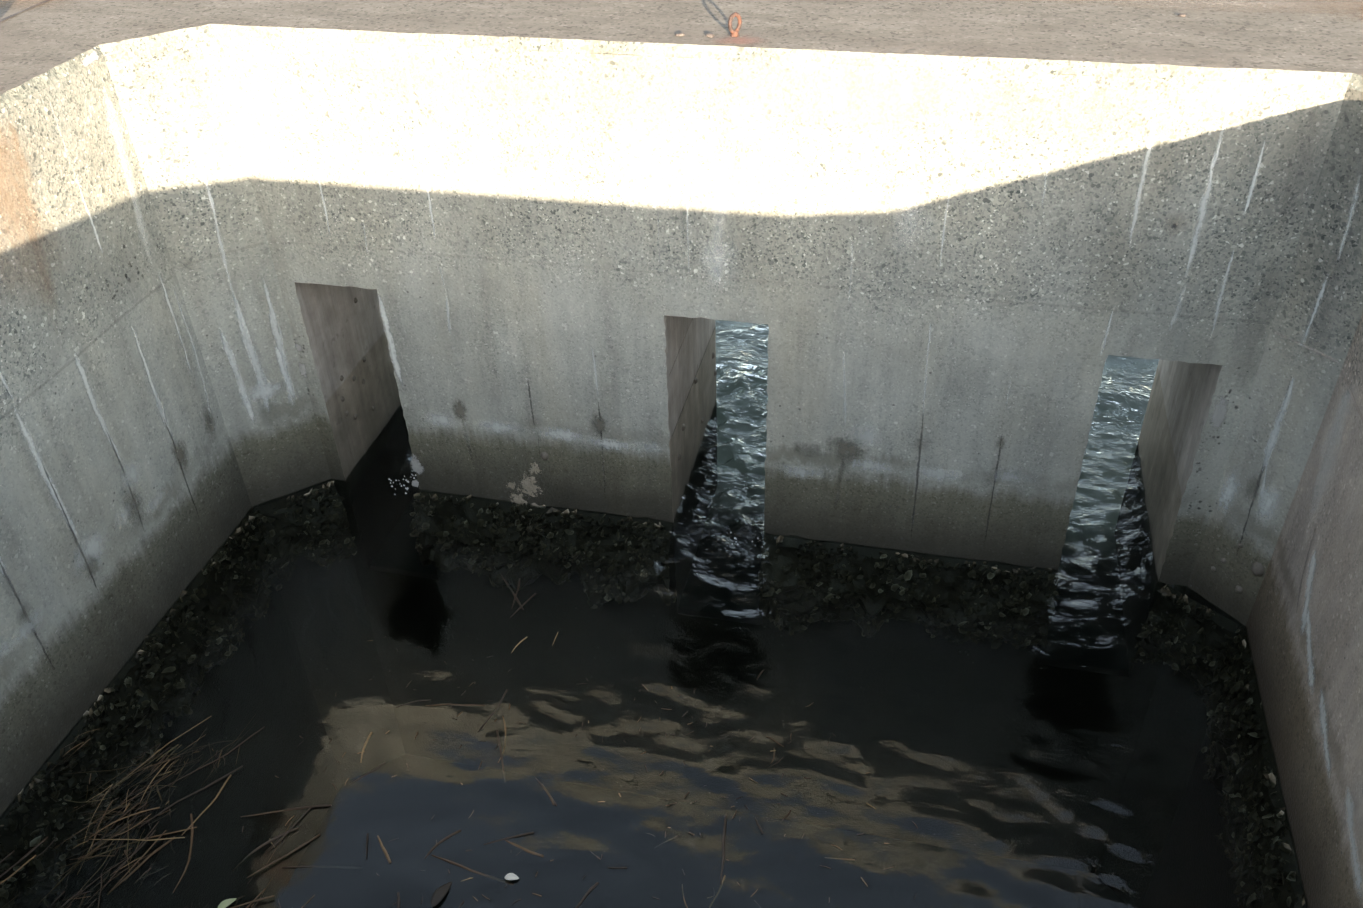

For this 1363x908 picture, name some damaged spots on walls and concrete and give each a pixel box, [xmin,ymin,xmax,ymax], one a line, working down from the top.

damp [162,283,213,429]
damp [222,287,295,420]
damp [433,401,465,423]
crack [911,419,923,531]
crack [985,441,1004,539]